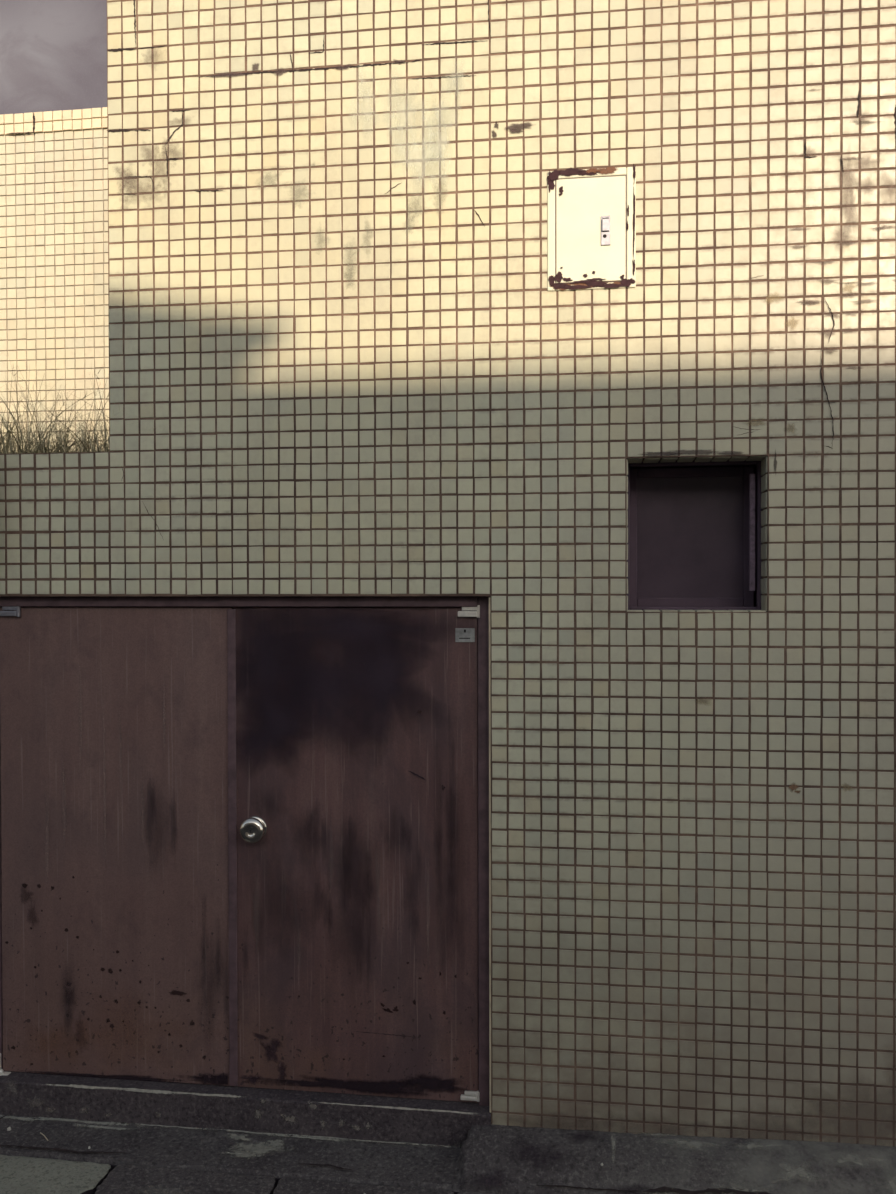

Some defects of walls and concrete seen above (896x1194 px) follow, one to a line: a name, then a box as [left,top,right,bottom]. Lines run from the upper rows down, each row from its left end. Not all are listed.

corrosion [626,164,636,276]
crack [538,1185,770,1194]